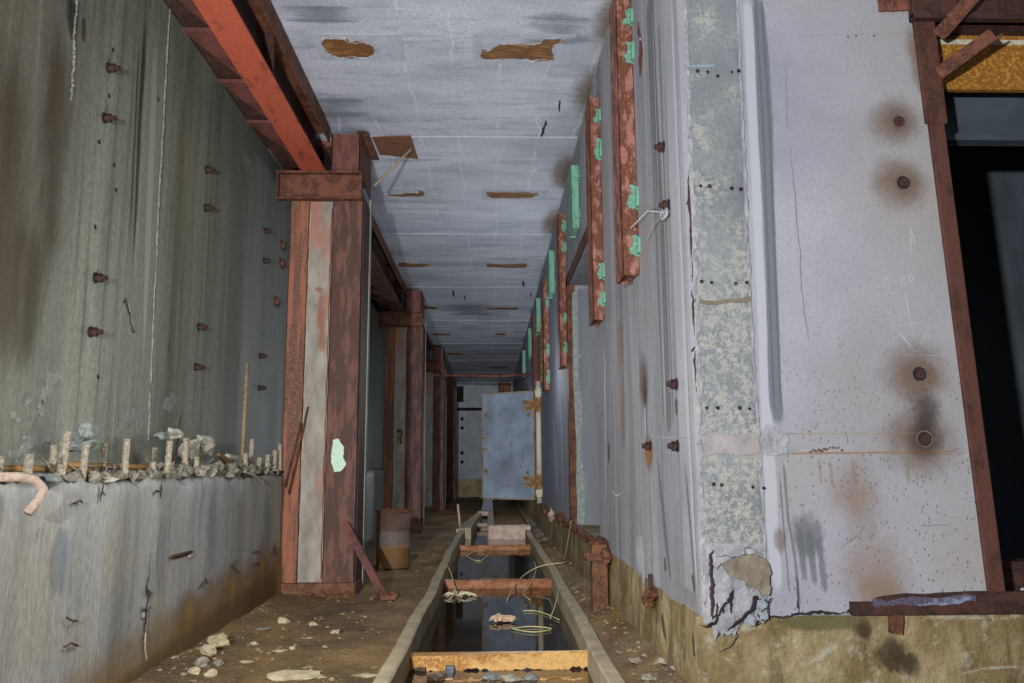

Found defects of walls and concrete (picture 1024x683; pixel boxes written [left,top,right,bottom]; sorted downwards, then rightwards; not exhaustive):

peeling [311,33,407,61]
peeling [473,33,577,64]
corrosion [882,107,907,133]
peeling [481,189,548,200]
corrosion [882,169,916,197]
spalling [601,0,776,615]
spalling [0,369,200,516]
corrosion [791,360,952,461]
crack [141,553,153,660]
crack [700,547,846,652]